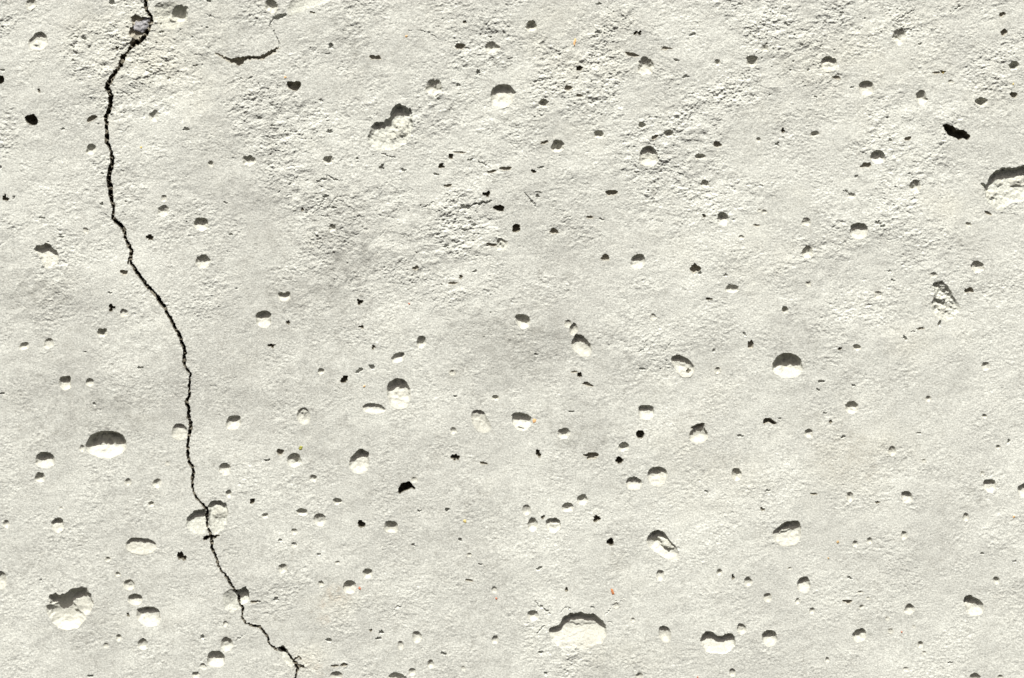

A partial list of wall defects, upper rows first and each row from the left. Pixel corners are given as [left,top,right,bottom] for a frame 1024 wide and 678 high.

crack [103,0,305,678]